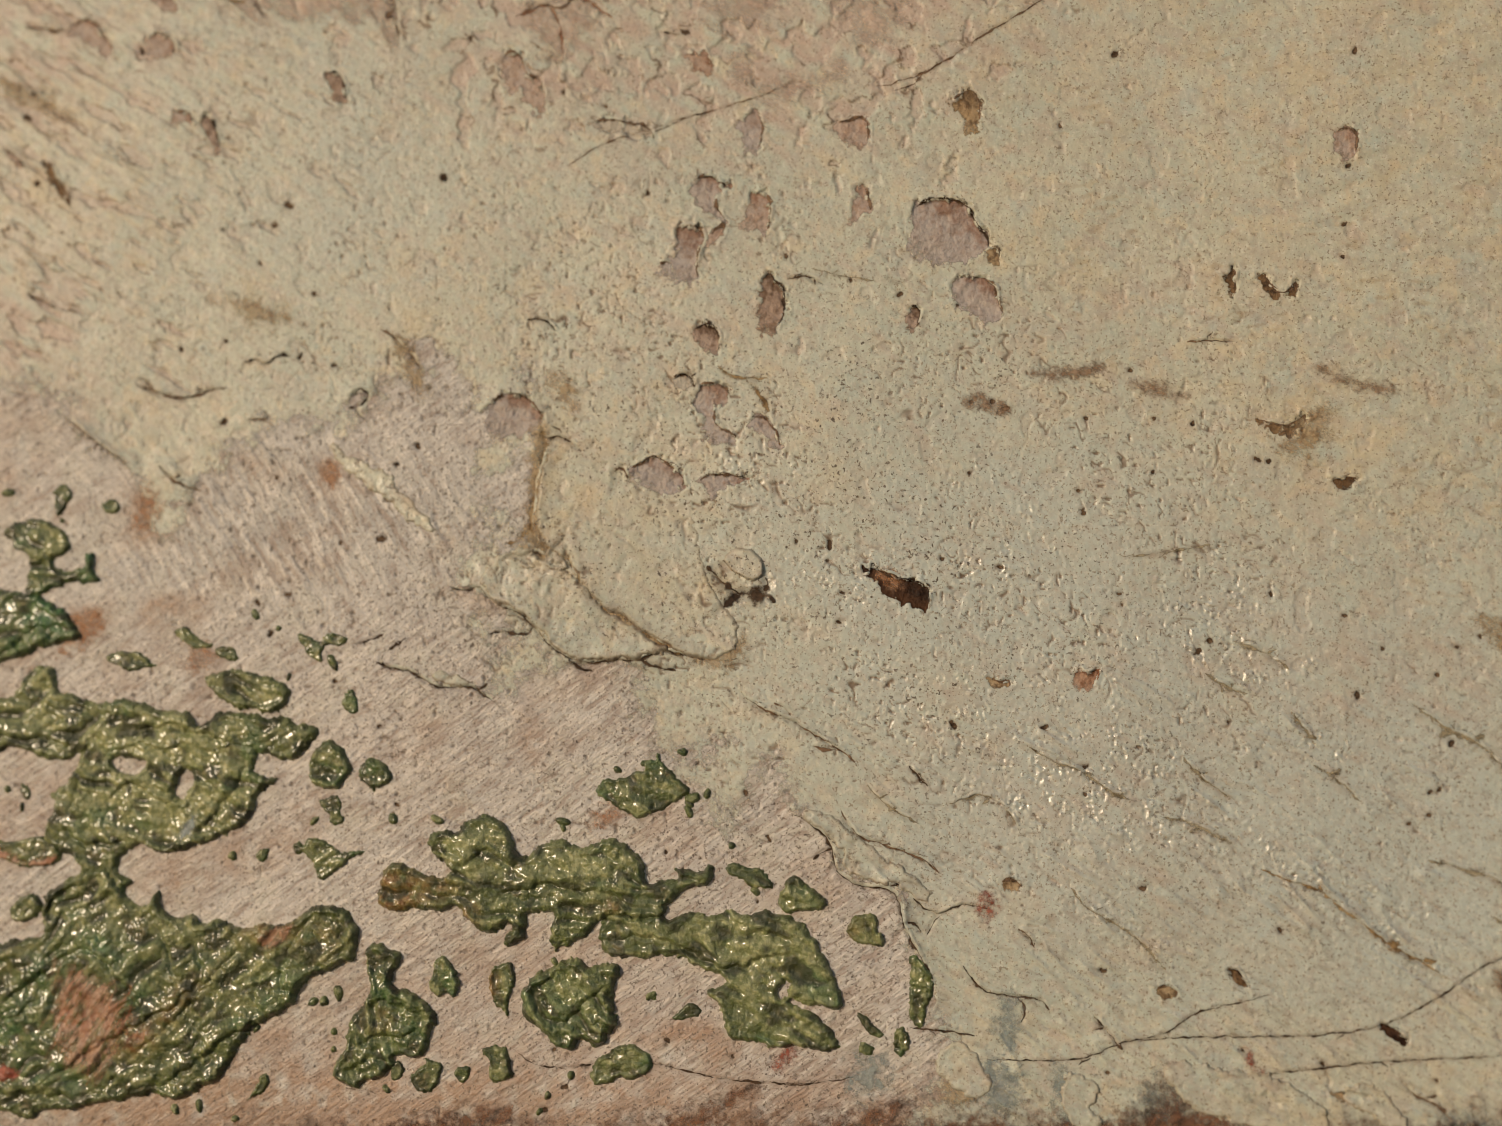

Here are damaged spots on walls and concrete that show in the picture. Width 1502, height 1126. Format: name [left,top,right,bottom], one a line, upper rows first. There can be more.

spalling [692,319,724,356]
spalling [897,292,924,333]
crack [673,364,770,412]
crack [362,634,494,702]
crack [1206,638,1292,695]
peeling [0,336,992,1126]
crack [449,413,1052,1022]
crack [1291,708,1364,803]
crack [1410,699,1502,763]
crack [910,745,1502,1123]
crack [510,1047,593,1069]
crack [652,1063,853,1086]